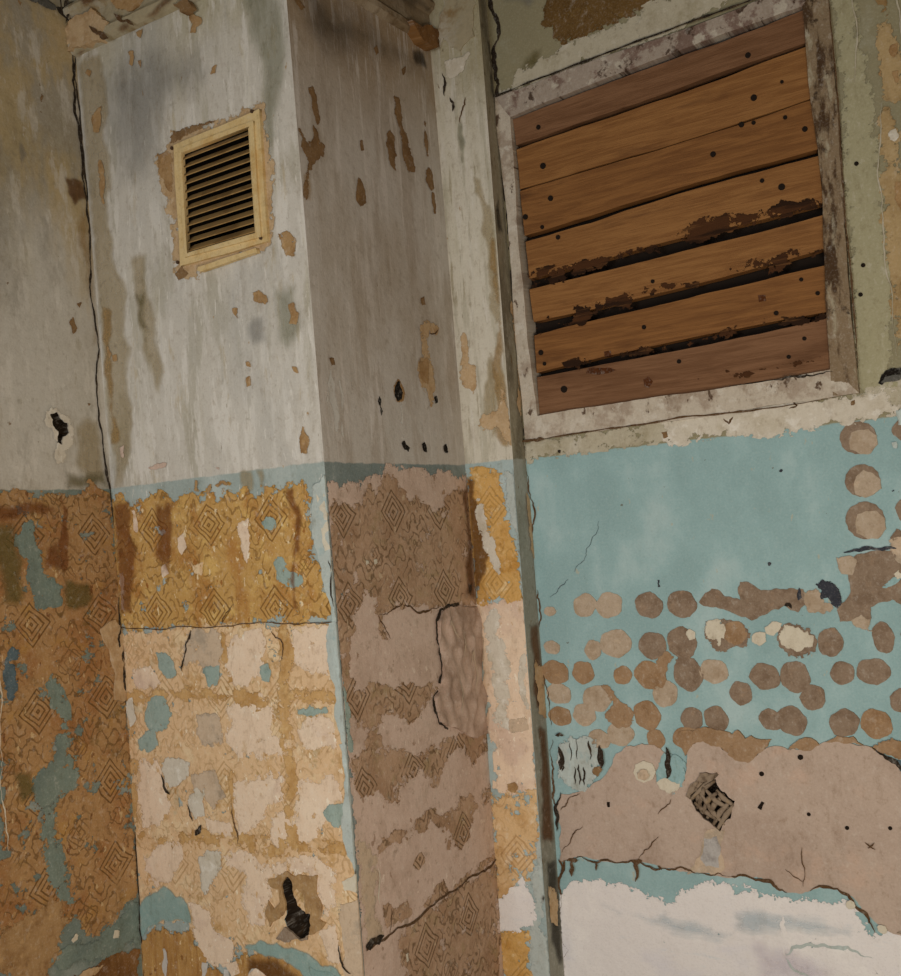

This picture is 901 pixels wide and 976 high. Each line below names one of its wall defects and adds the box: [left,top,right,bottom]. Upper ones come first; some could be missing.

peeling [173,0,202,33]
flaking render [44,407,74,464]
peeling [803,580,842,614]
peeling [686,619,726,646]
peeling [751,621,814,652]
flaking render [0,463,547,976]
flaking render [555,726,901,935]
crack [366,859,496,951]
peeling [482,804,559,976]